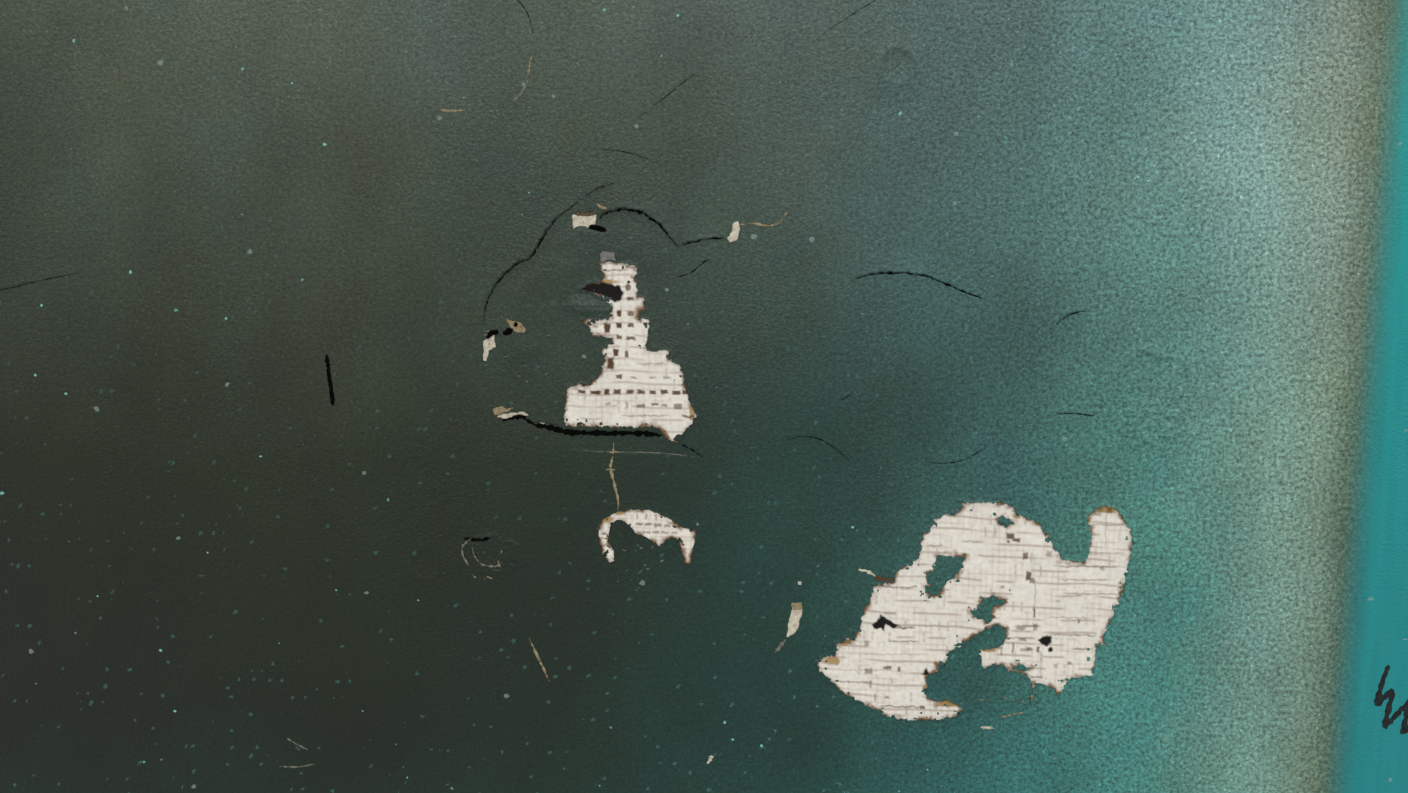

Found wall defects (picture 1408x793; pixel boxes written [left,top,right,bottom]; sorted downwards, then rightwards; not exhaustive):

peeling [483,317,526,361]
crack [445,149,728,371]
peeling [572,204,607,232]
peeling [493,251,708,574]
peeling [804,489,1146,733]